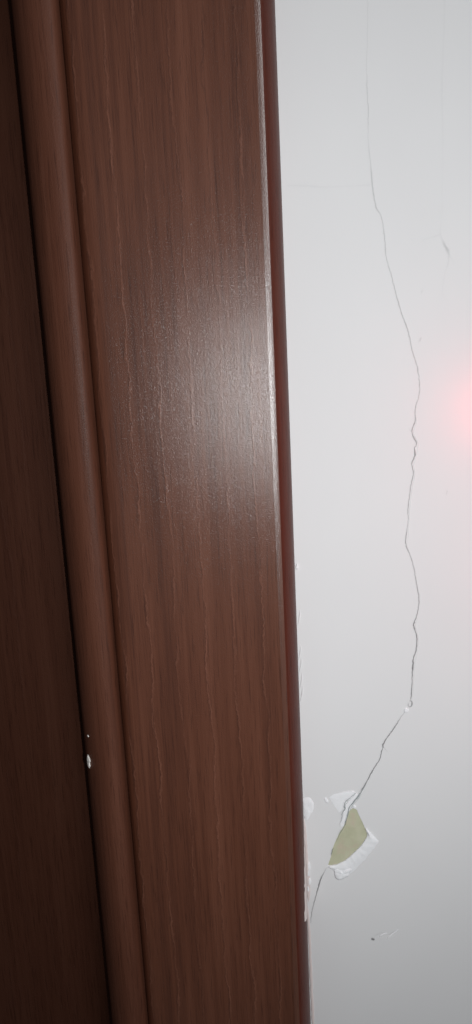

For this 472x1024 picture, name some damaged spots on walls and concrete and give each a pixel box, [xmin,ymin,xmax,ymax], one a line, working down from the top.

crack [363,618,420,788]
peeling [303,788,378,880]